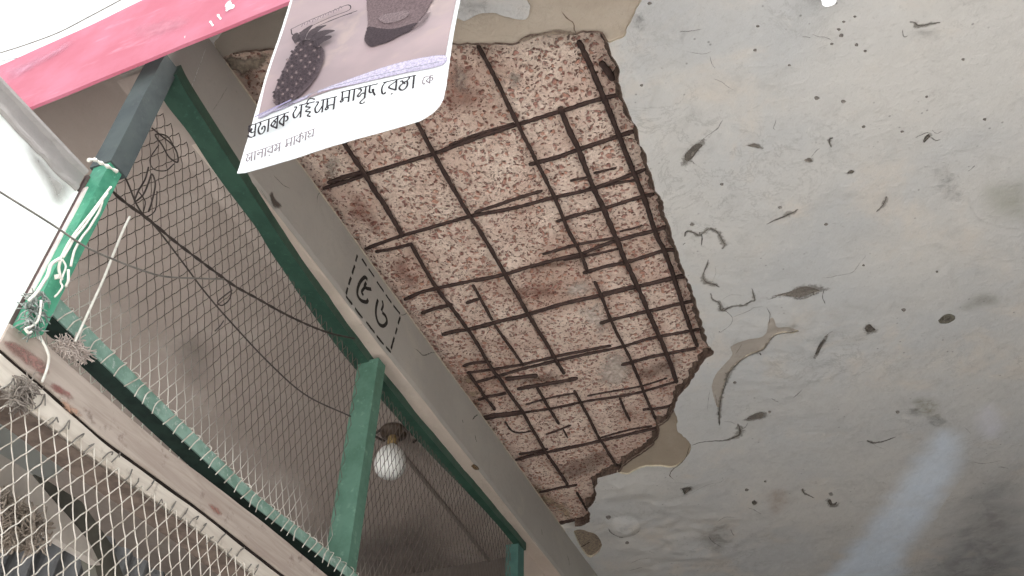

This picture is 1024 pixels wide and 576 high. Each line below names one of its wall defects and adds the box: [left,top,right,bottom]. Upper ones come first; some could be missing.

spalling [296,0,714,557]
peeling [712,318,799,407]